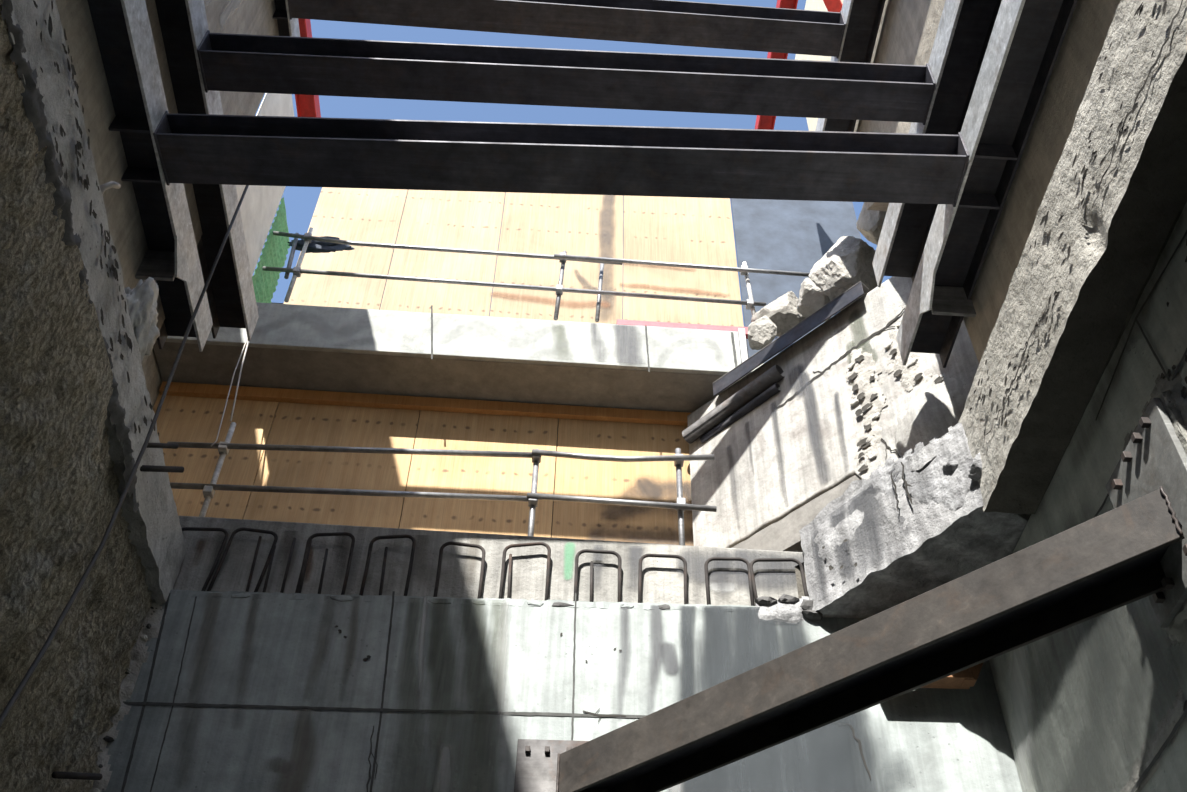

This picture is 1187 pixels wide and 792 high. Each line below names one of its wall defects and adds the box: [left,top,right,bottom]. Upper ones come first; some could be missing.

crack [1092,0,1183,208]
spalling [1,0,184,513]
water stain [771,403,781,453]
water stain [790,366,827,481]
water stain [835,393,843,435]
crack [776,307,906,409]
crack [873,435,912,512]
spalling [845,321,944,477]
water stain [408,598,452,713]
water stain [465,599,506,792]
crack [366,726,378,792]